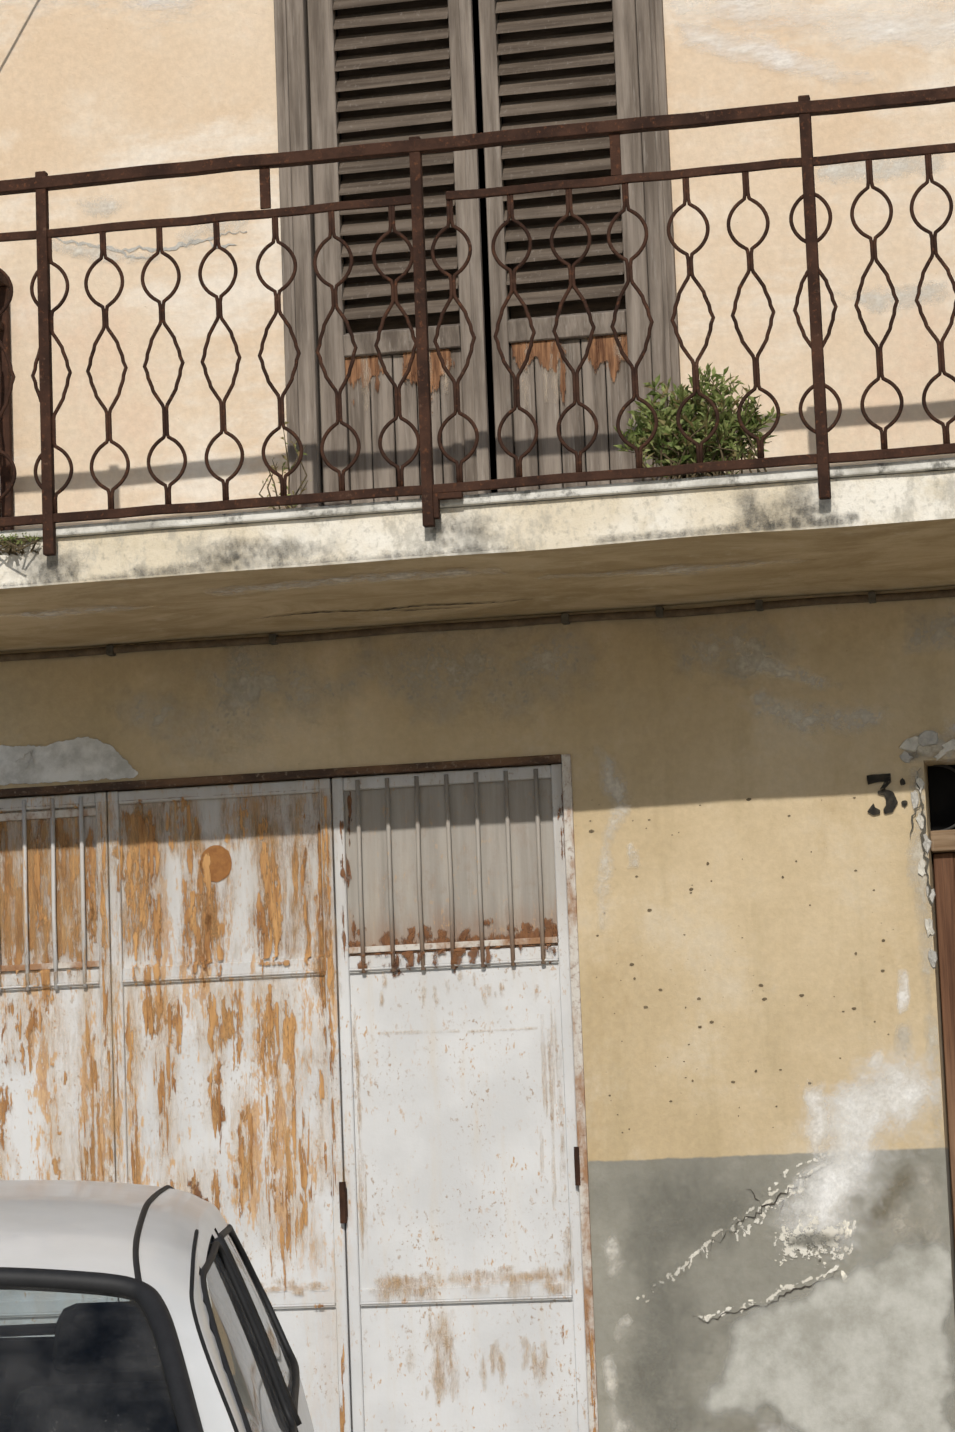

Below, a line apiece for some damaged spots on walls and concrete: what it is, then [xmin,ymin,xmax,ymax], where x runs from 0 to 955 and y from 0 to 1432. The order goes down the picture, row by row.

peeling [345,355,384,405]
peeling [402,350,455,392]
peeling [511,340,566,372]
peeling [587,333,628,382]
peeling [899,730,955,973]
rust [0,790,558,1291]
damp [898,974,909,1008]
damp [799,1056,922,1230]
crack [636,1146,845,1303]
crack [692,1220,859,1323]
rust [586,1301,596,1432]